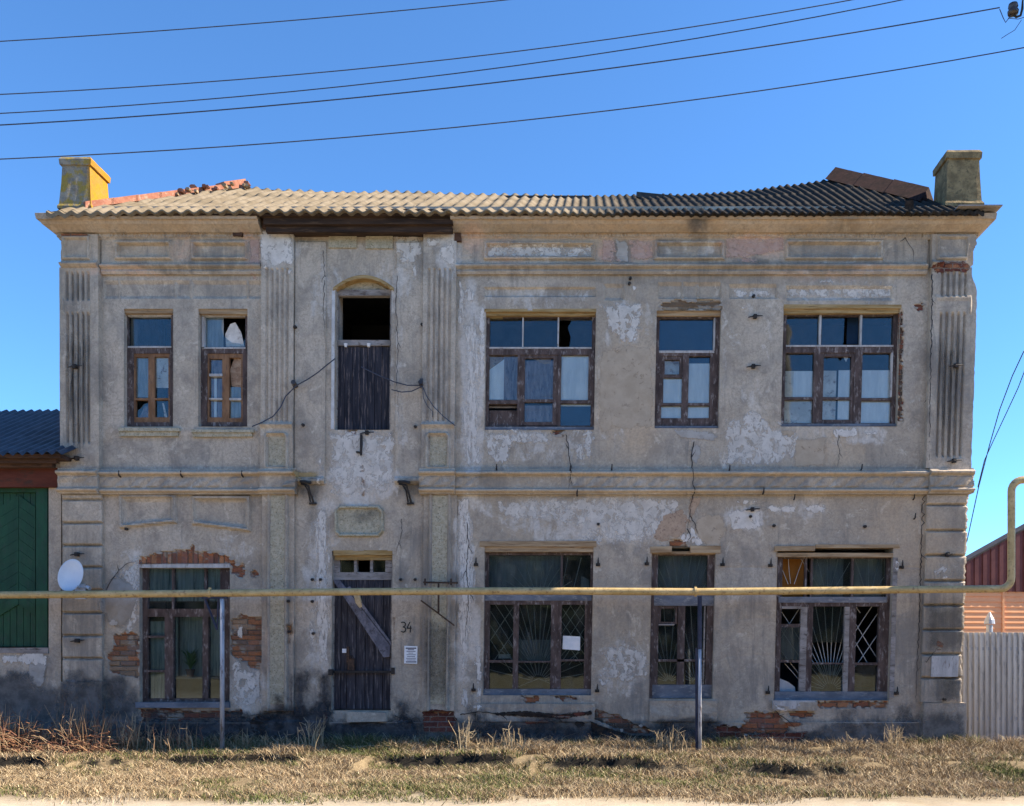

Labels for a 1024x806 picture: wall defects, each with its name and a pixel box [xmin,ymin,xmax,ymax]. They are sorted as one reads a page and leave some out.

peeling [260,231,293,274]
spalling [931,261,970,274]
flaking render [576,303,653,459]
peeling [316,430,395,497]
peeling [725,412,798,465]
crack [687,442,698,540]
peeling [498,495,825,546]
spalling [124,545,259,590]
spalling [138,614,281,738]
leakage [0,671,419,744]
spalling [496,696,651,741]
spalling [714,701,887,744]